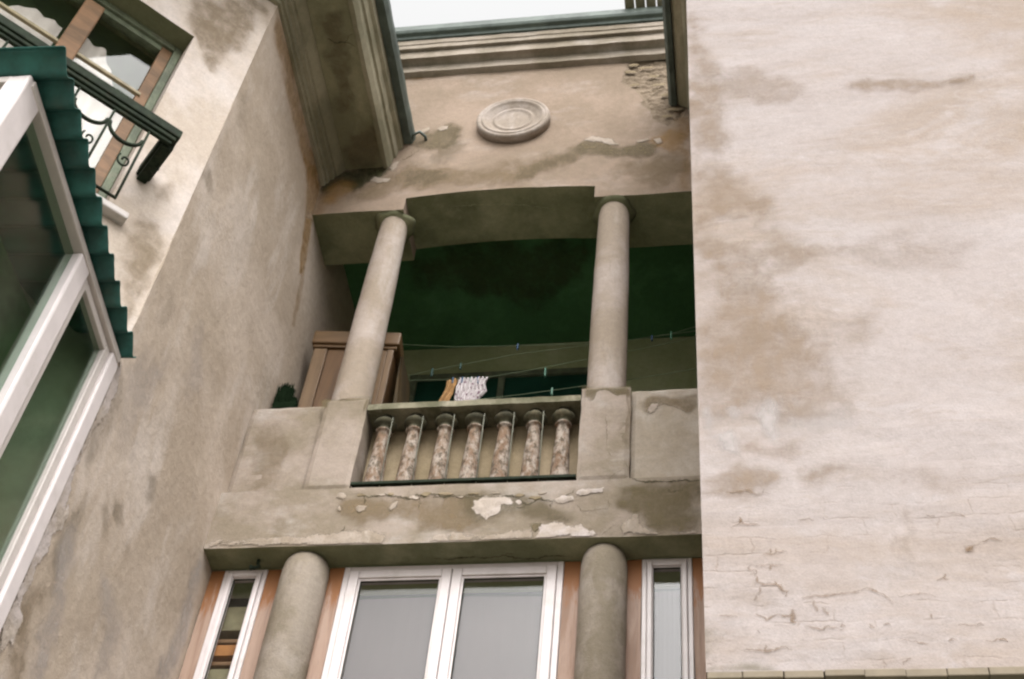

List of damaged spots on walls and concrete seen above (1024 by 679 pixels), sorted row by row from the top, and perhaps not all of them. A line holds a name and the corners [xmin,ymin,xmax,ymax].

water stain [196,0,264,60]
spalling [621,59,688,126]
water stain [321,132,550,198]
water stain [415,125,459,149]
water stain [578,142,654,157]
peeling [337,487,605,520]
peeling [430,521,596,541]
water stain [618,483,700,531]
crack [720,549,843,652]
crack [869,574,1007,664]